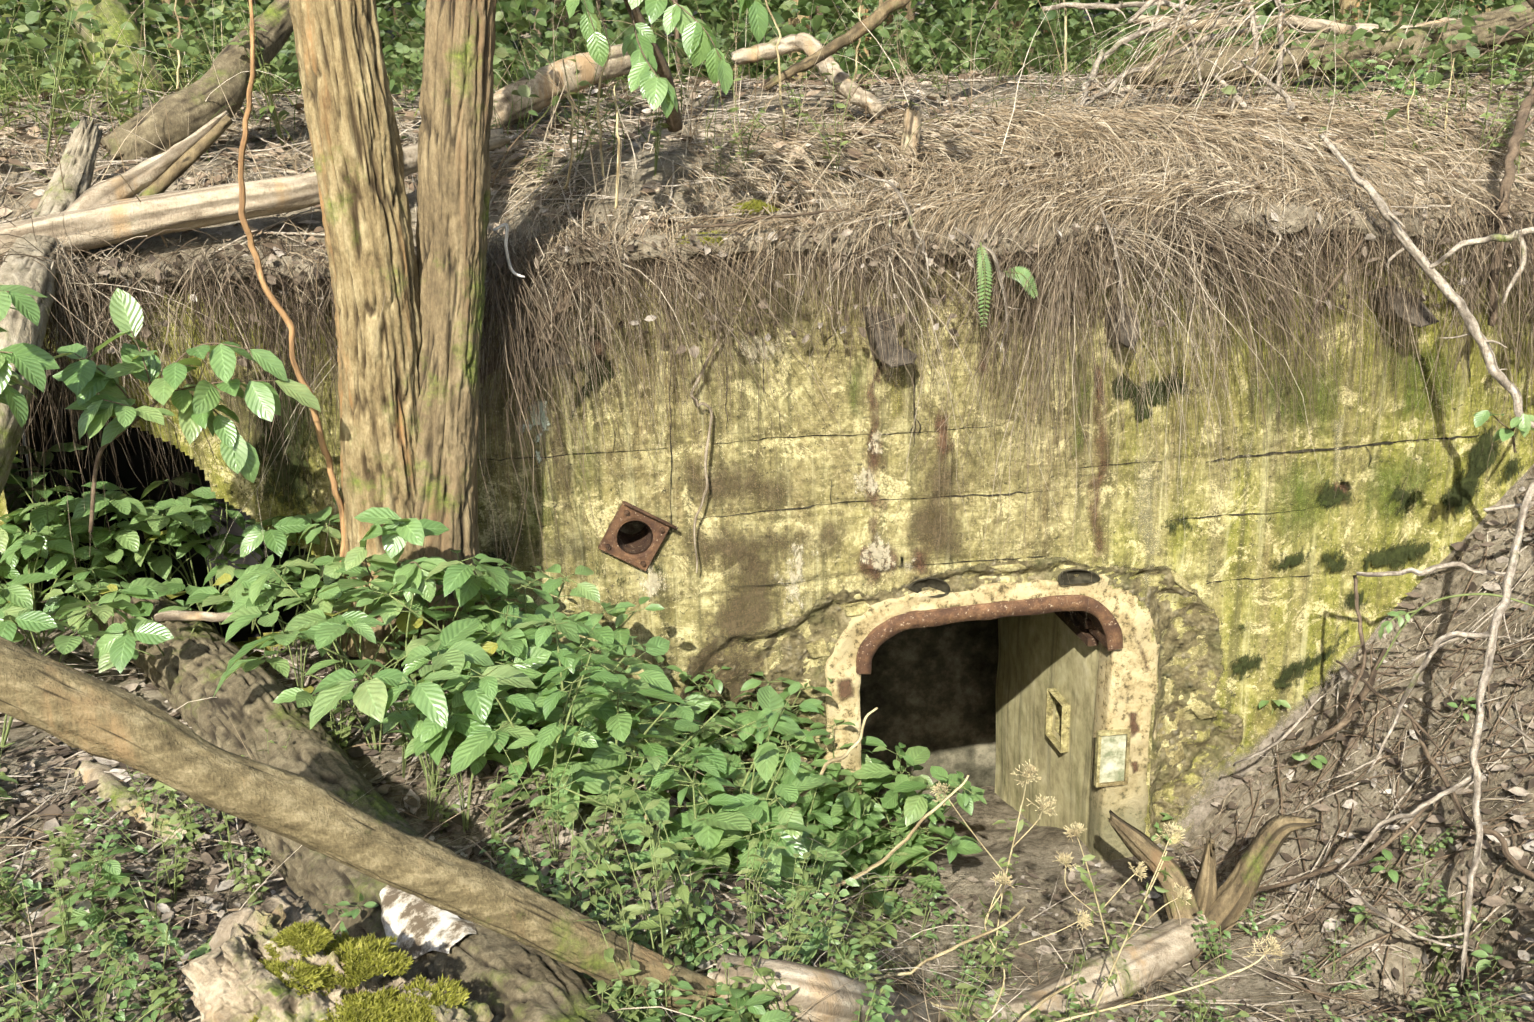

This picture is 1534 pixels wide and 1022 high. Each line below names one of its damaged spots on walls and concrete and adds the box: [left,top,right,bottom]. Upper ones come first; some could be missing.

crack [1206,435,1479,465]
leakage [854,467,877,493]
leakage [860,534,915,571]